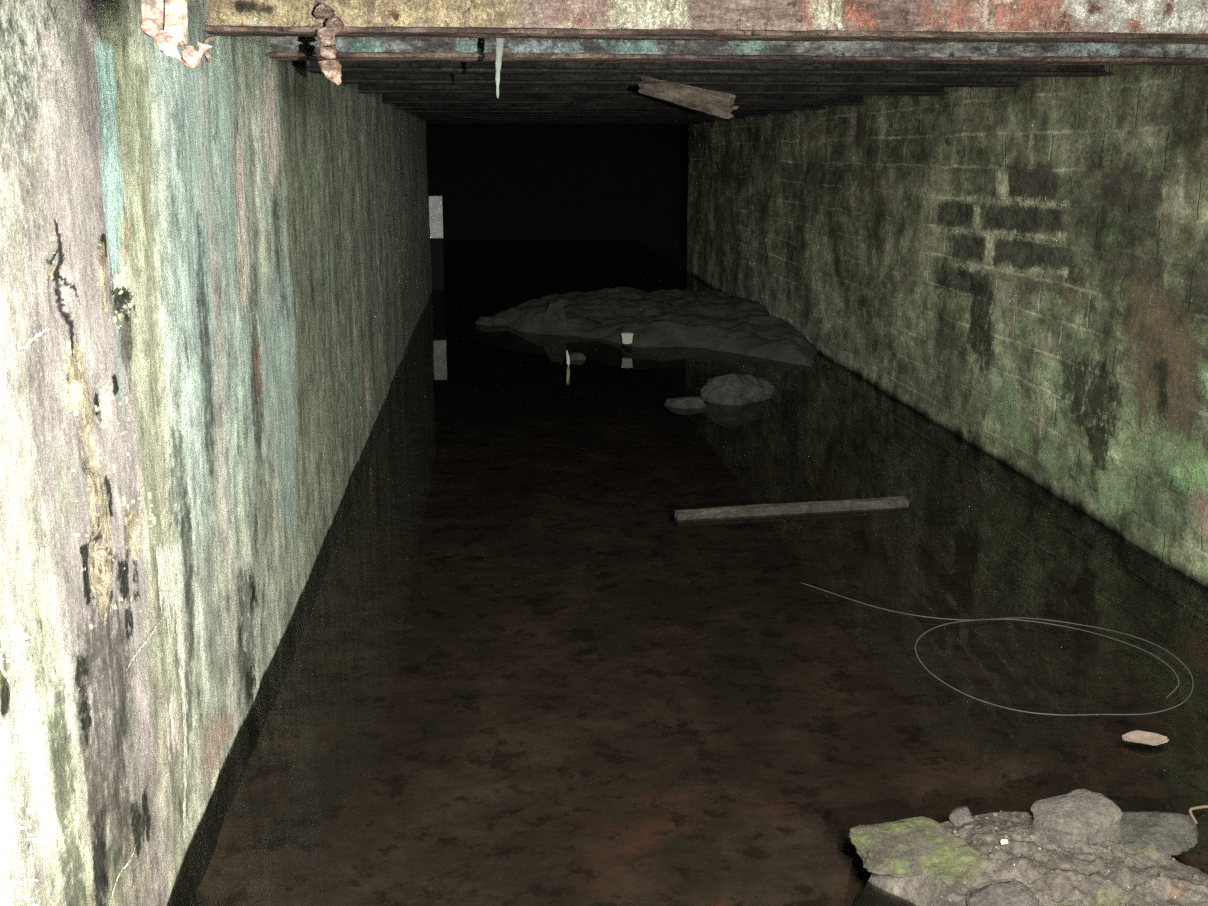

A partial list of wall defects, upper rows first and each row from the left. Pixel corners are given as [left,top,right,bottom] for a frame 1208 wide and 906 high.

rust [841,0,877,30]
rust [919,0,1072,32]
crack [46,220,80,356]
leakage [967,281,1021,369]
leakage [1045,330,1121,475]
leakage [124,606,134,649]
leakage [75,654,92,744]
leakage [0,803,44,906]
leakage [92,808,110,906]
leakage [131,790,151,857]